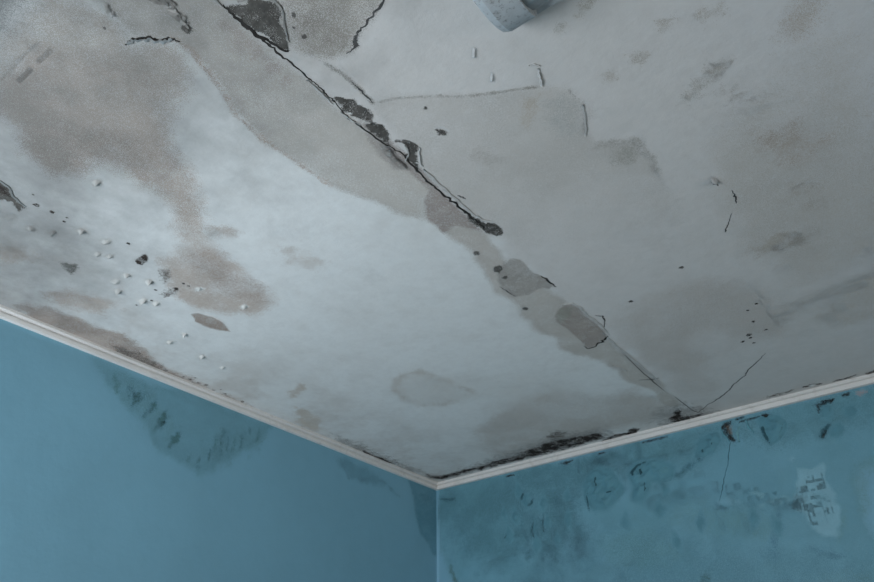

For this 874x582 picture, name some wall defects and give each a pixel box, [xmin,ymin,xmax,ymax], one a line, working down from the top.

spalling [0,180,54,214]
peeling [224,0,423,171]
crack [214,0,485,229]
water stain [0,0,720,480]
spalling [463,212,503,236]
crack [603,333,766,413]
water stain [409,384,874,582]